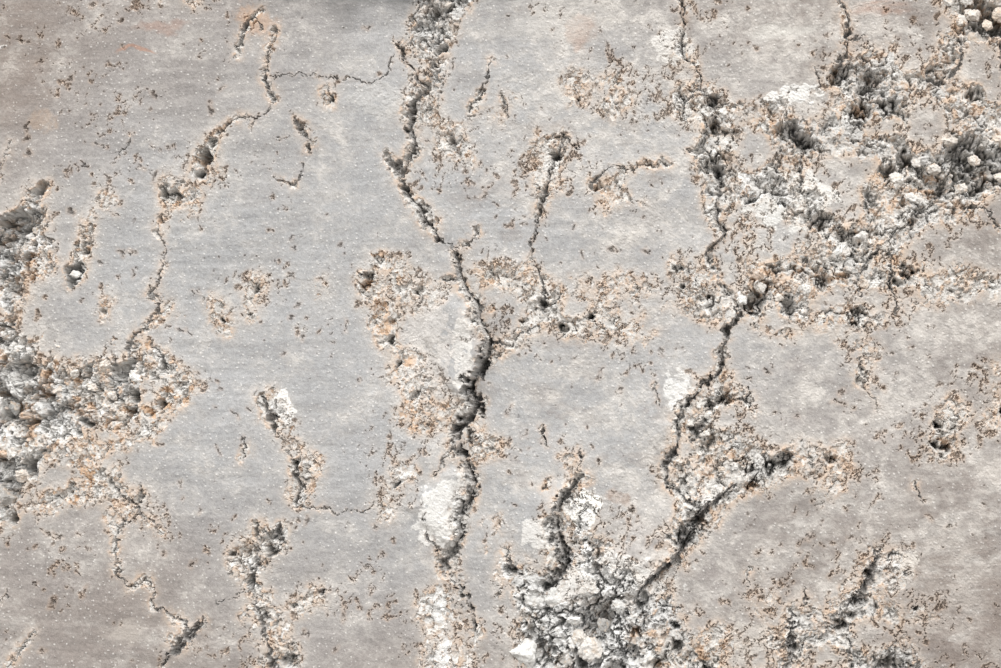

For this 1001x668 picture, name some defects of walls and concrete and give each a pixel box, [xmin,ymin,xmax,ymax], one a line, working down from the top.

crack [114,139,132,160]
flaking render [667,0,1001,347]
flaking render [0,175,208,533]
crack [108,452,375,668]
crack [216,8,586,634]
flaking render [385,462,421,493]
flaking render [355,251,462,437]
flaking render [463,424,505,463]
flaking render [495,501,735,668]
crack [588,0,755,614]
flaking render [766,555,941,668]